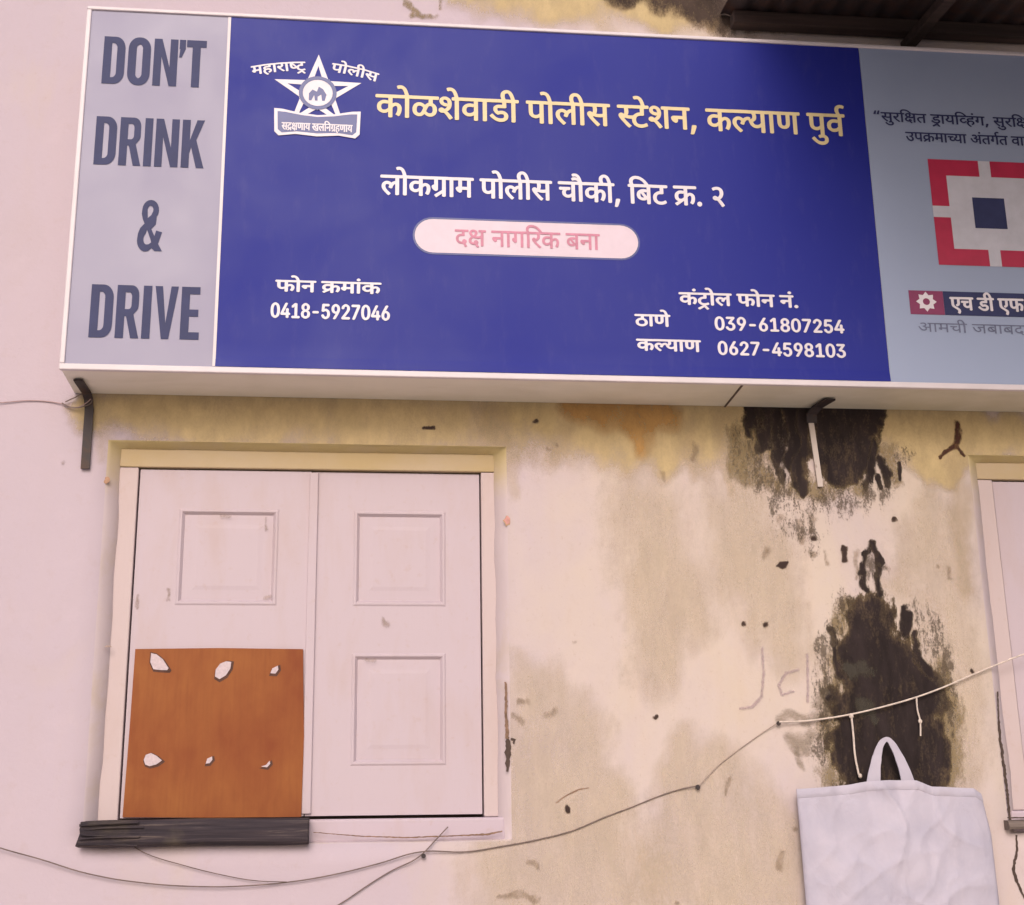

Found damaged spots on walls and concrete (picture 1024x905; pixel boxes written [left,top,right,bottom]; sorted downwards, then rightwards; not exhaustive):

leakage [68,393,1024,556]
leakage [811,539,971,787]